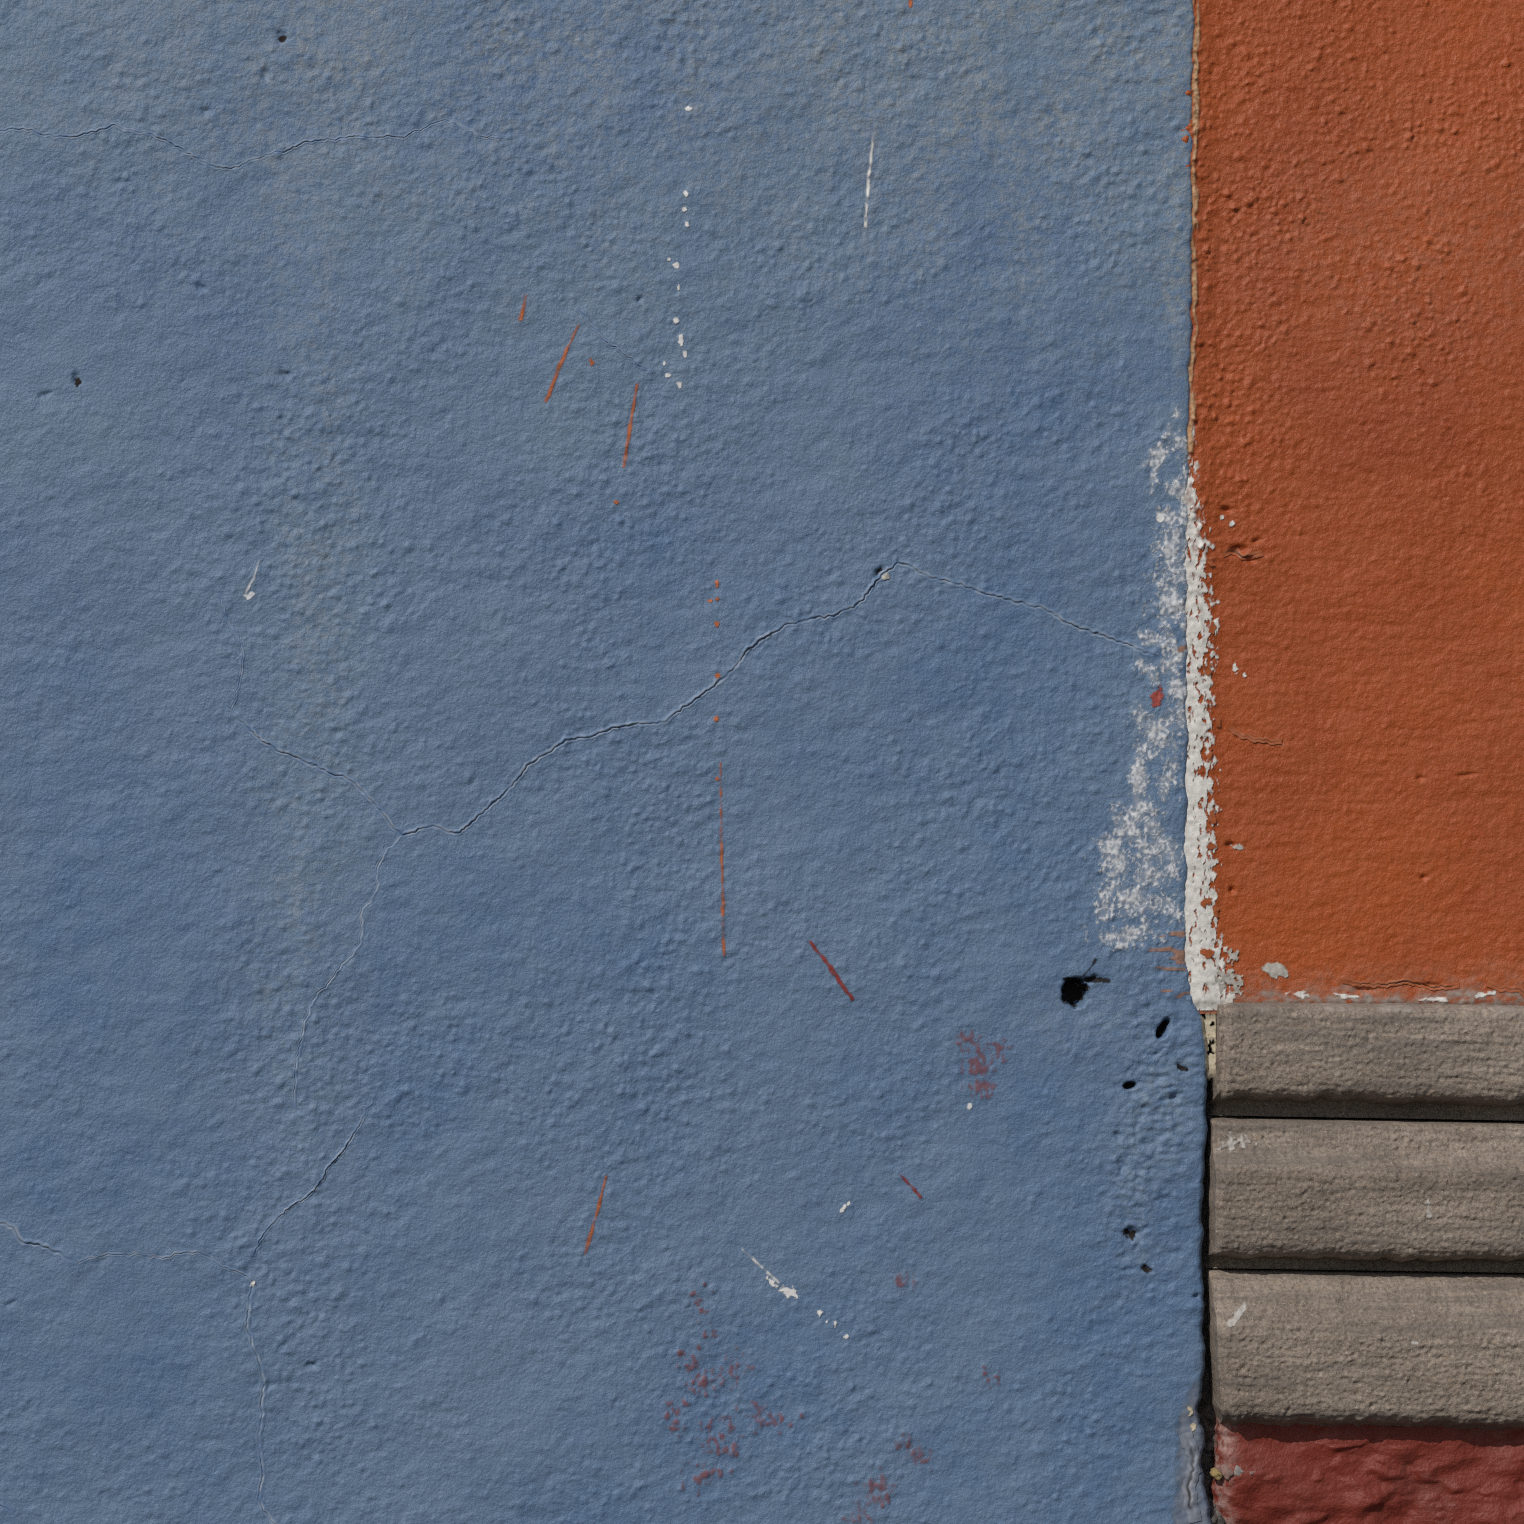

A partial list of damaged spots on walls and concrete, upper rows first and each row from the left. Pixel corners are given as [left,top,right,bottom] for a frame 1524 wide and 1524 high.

crack [0,118,511,171]
crack [217,559,1161,1108]
hole [1061,959,1110,1008]
crack [0,1094,379,1524]